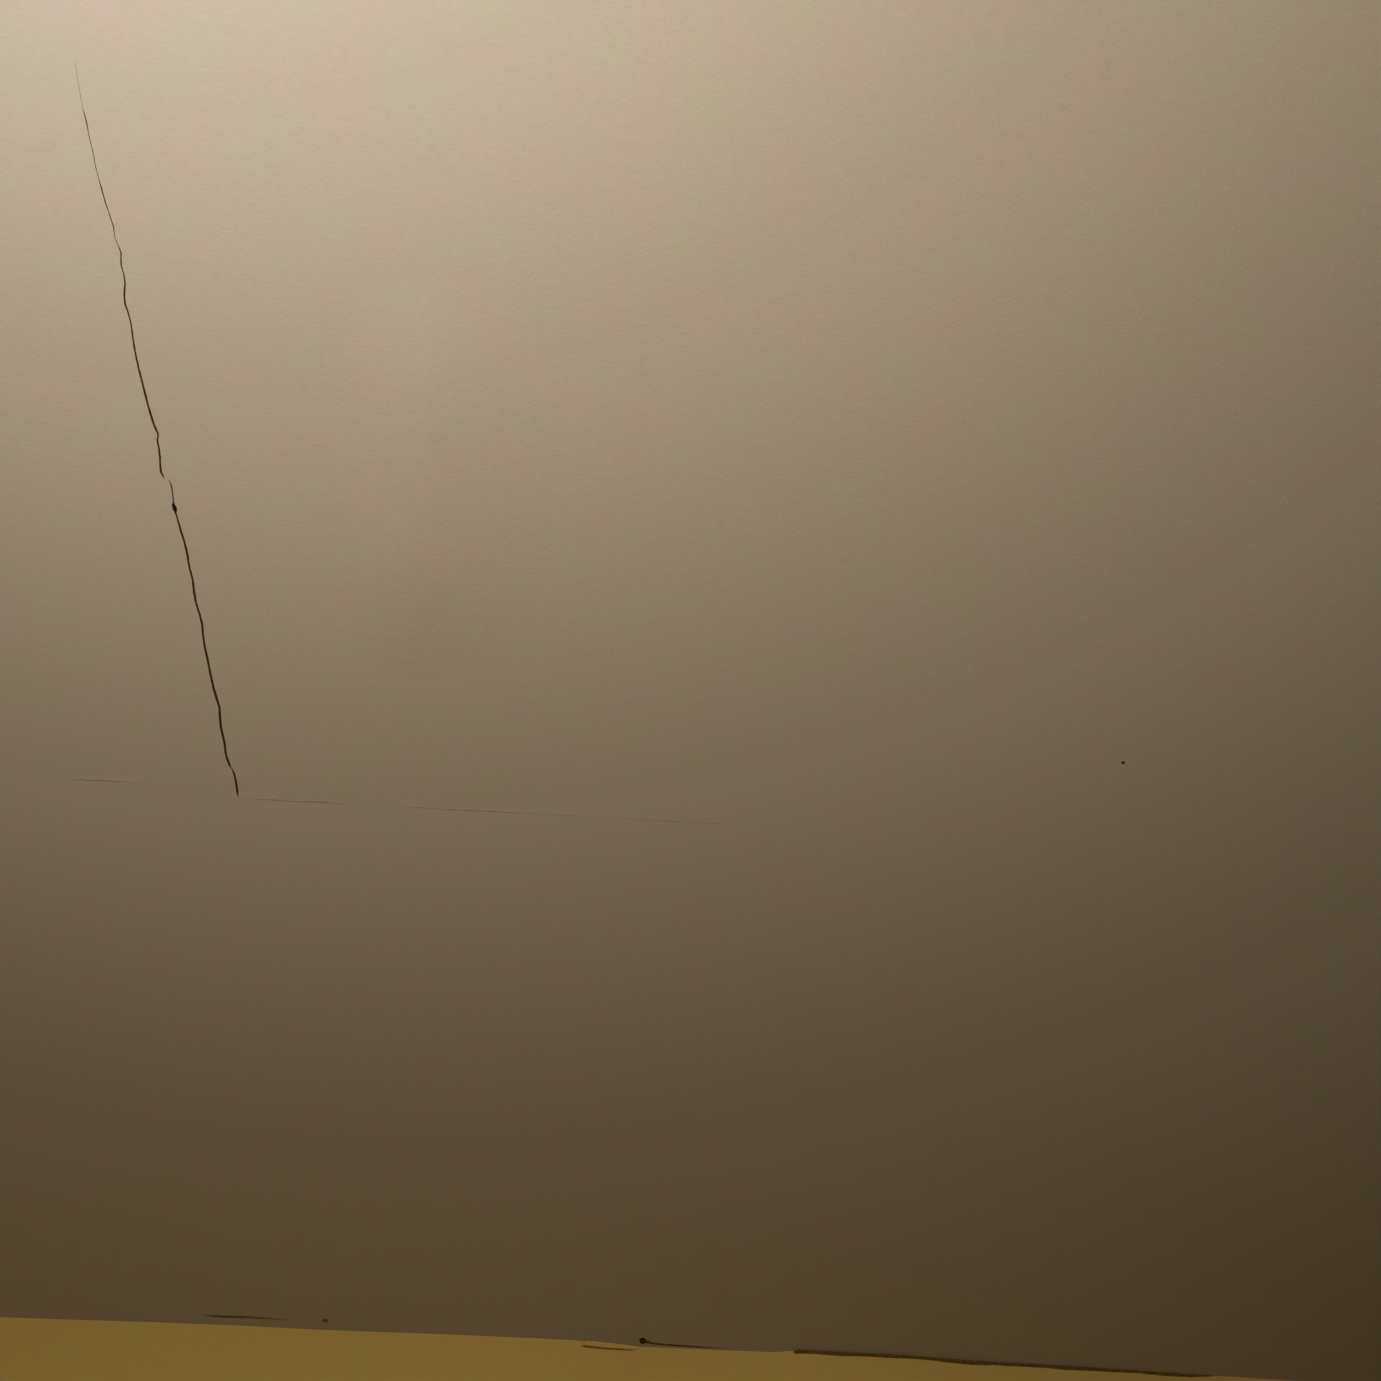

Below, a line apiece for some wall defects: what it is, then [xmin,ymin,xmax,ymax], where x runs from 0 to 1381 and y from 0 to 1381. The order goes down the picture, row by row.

crack [72,65,343,804]